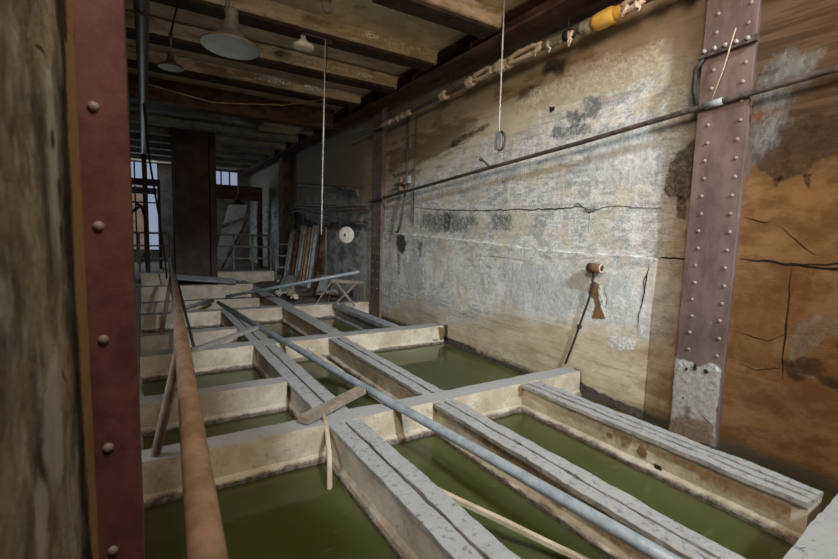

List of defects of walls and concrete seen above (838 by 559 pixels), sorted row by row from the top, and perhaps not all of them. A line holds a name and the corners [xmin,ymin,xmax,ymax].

water stain [421,211,477,232]
crack [411,203,642,229]
water stain [664,141,695,219]
crack [637,257,685,329]
crack [735,217,838,380]